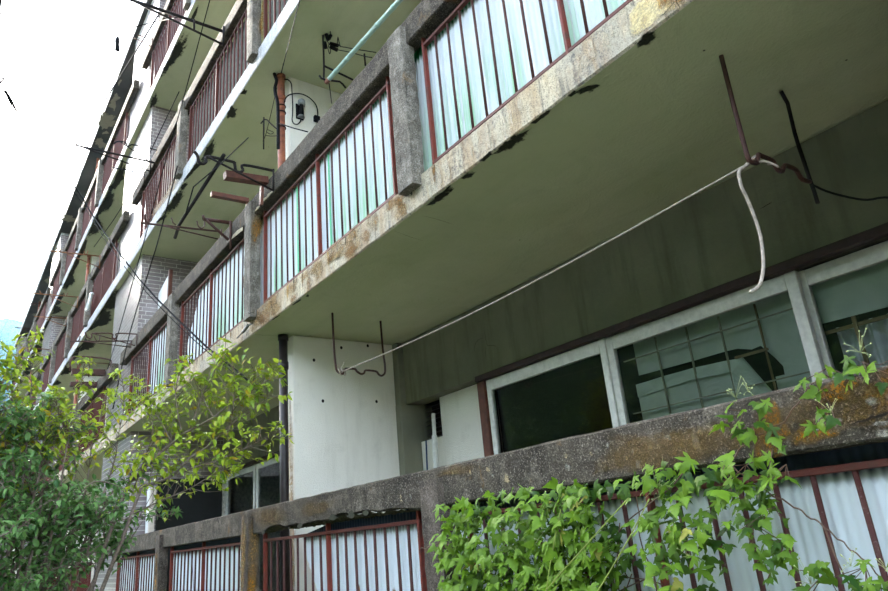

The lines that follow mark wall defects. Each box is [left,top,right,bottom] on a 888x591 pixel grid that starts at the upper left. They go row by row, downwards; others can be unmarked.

flaking render [575,0,675,71]
damp [637,31,656,48]
damp [568,84,600,97]
damp [480,110,550,161]
damp [427,185,454,205]
crack [853,411,888,424]